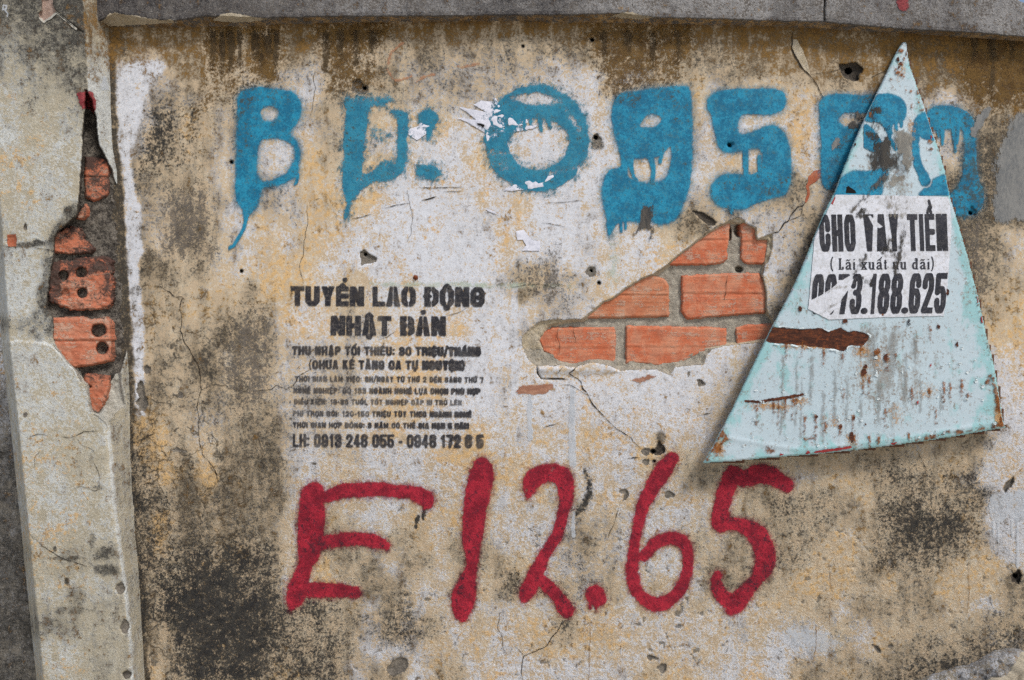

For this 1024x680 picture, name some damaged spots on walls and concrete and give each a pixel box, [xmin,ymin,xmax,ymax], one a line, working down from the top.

leakage [134,24,288,175]
leakage [309,22,392,103]
leakage [584,23,694,96]
crack [792,30,838,98]
leakage [952,36,1024,115]
spalling [46,91,151,426]
spalling [522,210,774,386]
crack [144,286,227,482]
crack [537,367,654,471]
leakage [130,426,346,680]
leakage [864,462,992,575]